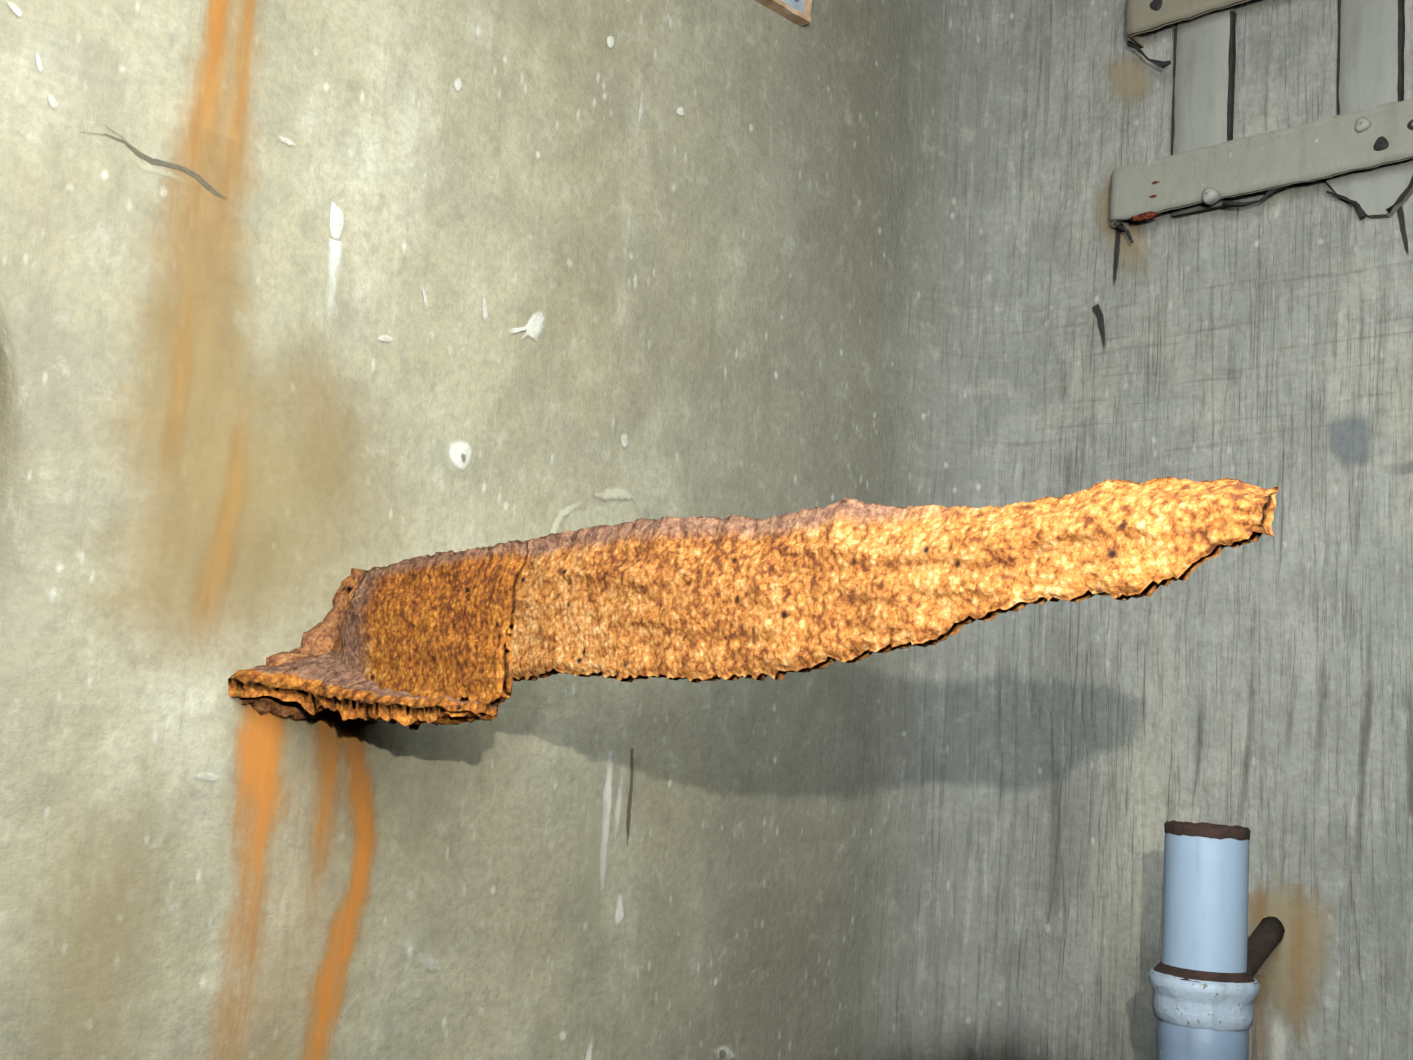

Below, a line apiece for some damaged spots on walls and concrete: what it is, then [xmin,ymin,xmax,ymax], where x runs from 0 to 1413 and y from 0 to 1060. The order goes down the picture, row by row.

rust [194,0,227,154]
crack [103,134,223,198]
rust [341,540,529,705]
rust [236,703,283,923]
rust [306,720,374,1060]